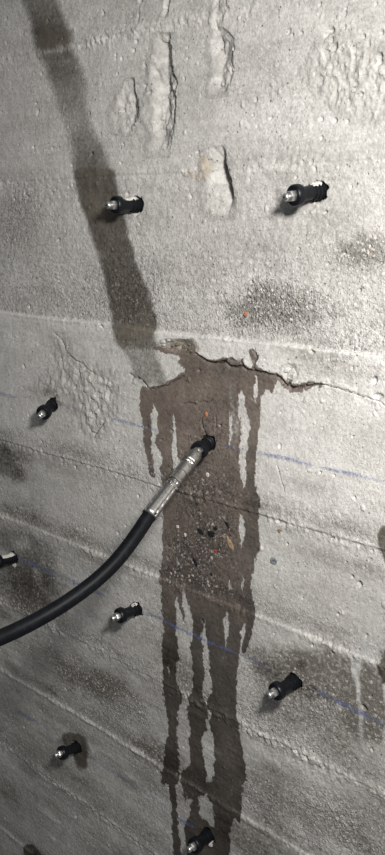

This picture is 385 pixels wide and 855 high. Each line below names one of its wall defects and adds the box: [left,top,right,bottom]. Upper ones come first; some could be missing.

water stain [26,0,78,102]
crack [202,357,384,405]
water stain [74,131,322,855]
water stain [350,584,385,745]